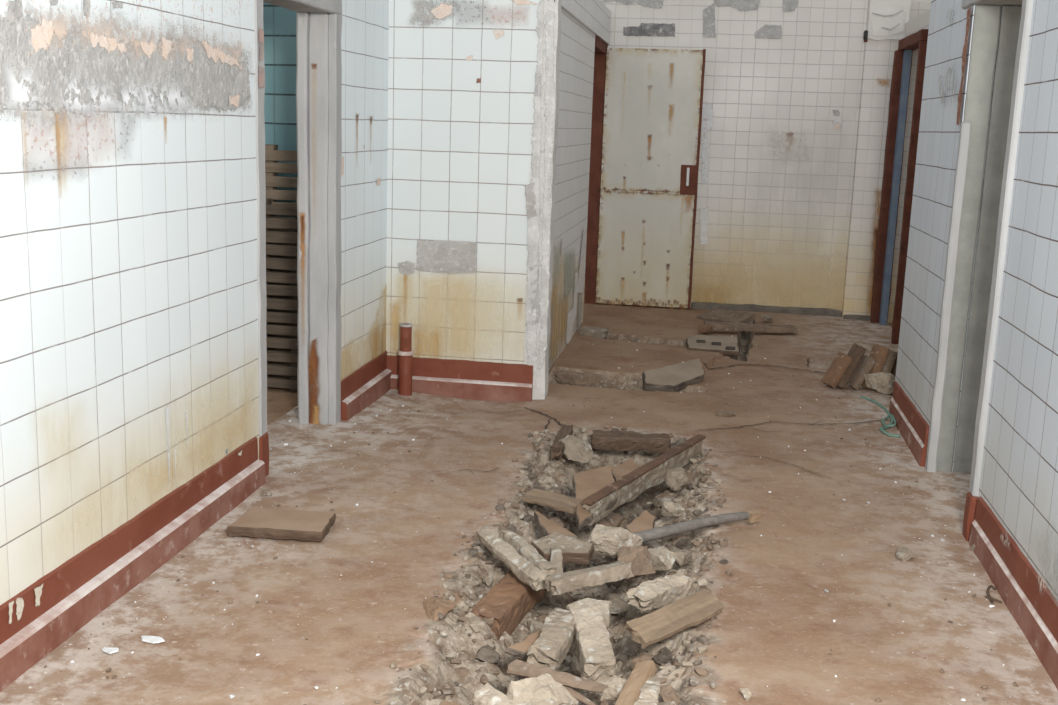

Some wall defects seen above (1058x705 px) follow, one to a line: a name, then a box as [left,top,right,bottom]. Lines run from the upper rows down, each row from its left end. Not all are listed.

peeling [703,0,760,38]
peeling [755,25,782,39]
peeling [782,0,799,12]
spalling [0,0,265,174]
spalling [411,0,564,374]
peeling [398,240,477,287]
rust [308,339,319,424]
peeling [9,584,43,624]